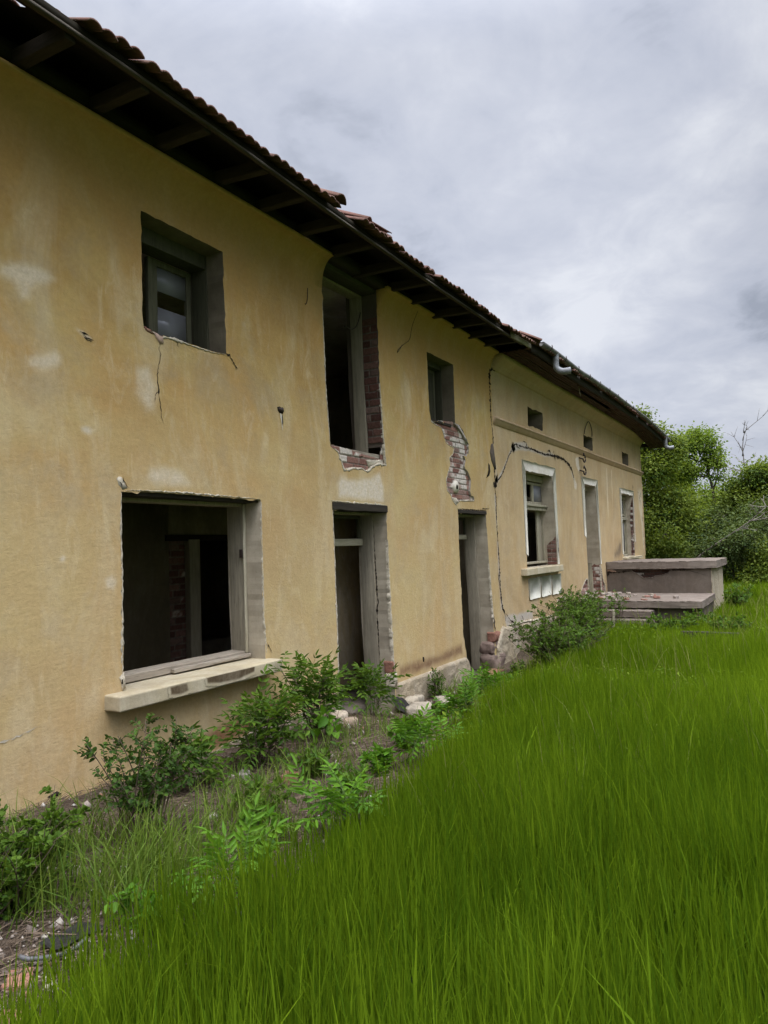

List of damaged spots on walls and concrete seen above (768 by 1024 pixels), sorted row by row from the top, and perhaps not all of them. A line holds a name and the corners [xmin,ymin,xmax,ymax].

crack [155,344,178,420]
flaking render [322,300,387,674]
spalling [431,420,487,511]
crack [486,367,578,623]